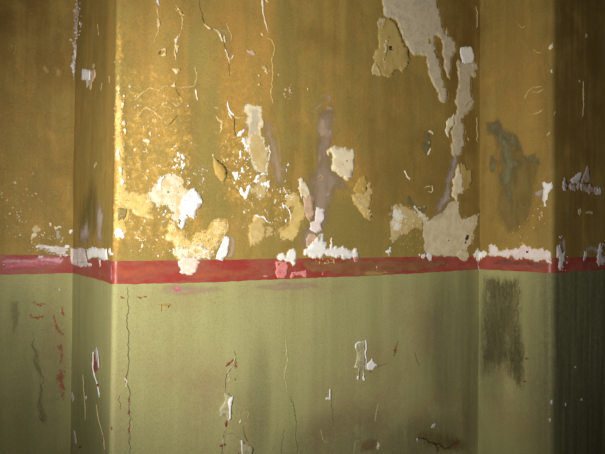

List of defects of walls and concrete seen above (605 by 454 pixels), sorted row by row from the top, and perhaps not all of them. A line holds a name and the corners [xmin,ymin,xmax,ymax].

crack [199,3,234,76]
spalling [371,0,478,157]
peeling [3,223,114,268]
peeling [113,68,235,275]
spalling [215,101,271,204]
peeling [326,145,374,221]
spalling [247,163,568,279]
damp [487,122,539,229]
peeling [562,166,602,195]
crack [118,290,133,449]
peeling [354,340,384,381]
damp [483,279,528,384]